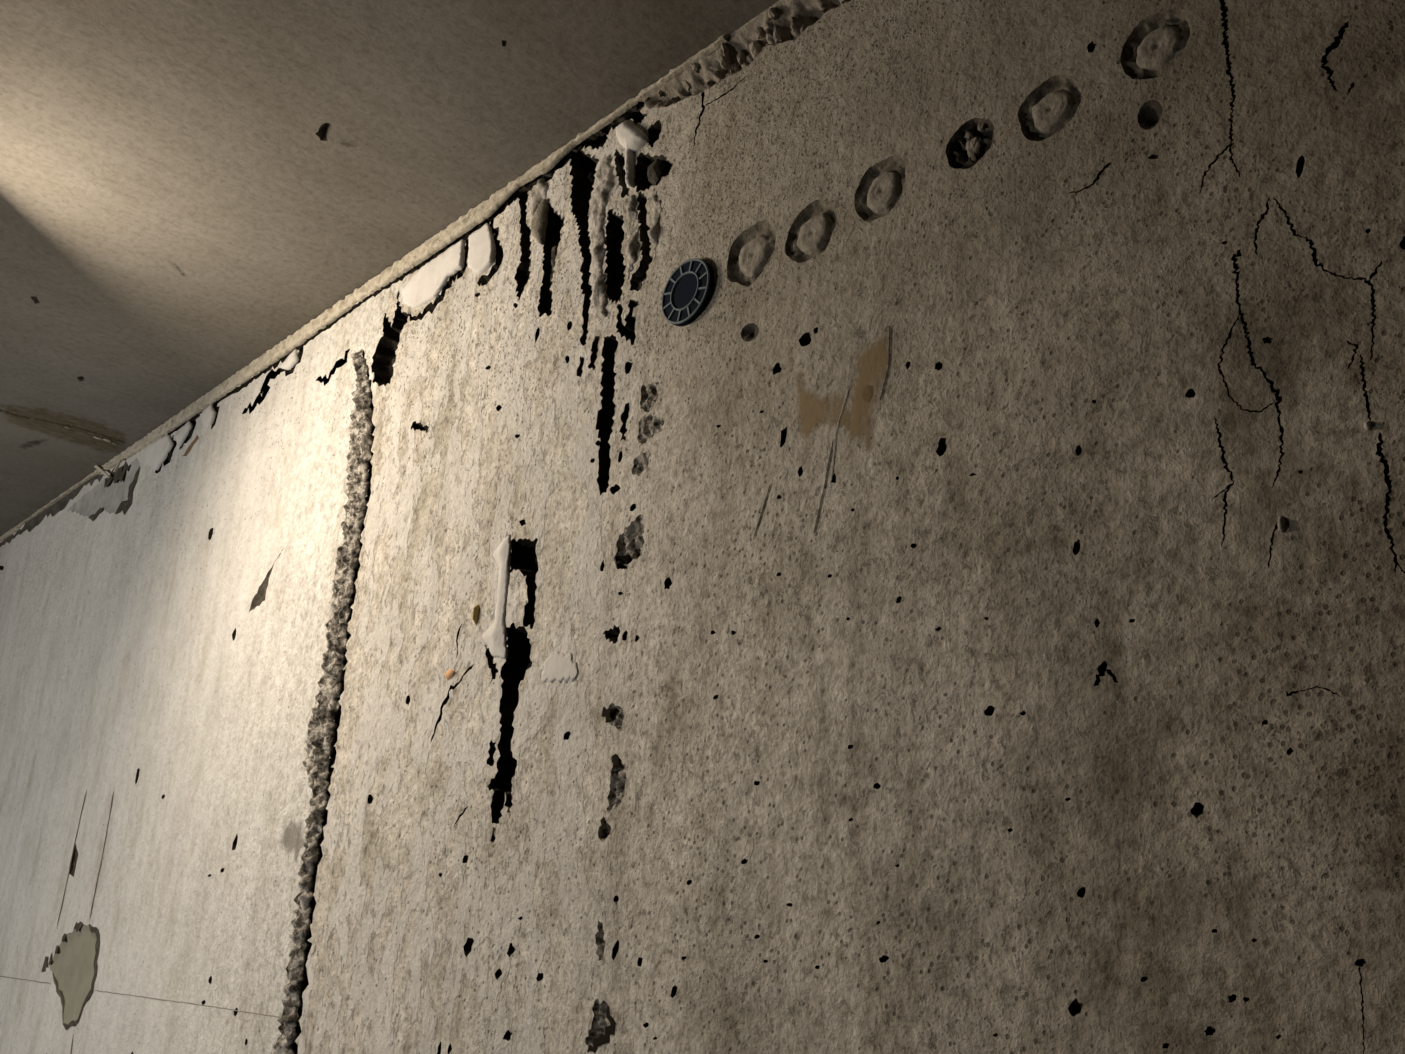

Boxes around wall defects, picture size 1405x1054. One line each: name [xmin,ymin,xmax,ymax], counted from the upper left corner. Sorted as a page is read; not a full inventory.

spalling [641,0,852,109]
crack [1200,0,1240,193]
crack [1321,21,1354,96]
leakage [616,120,650,188]
peeling [371,219,504,386]
crack [1213,197,1405,573]
peeling [0,401,220,547]
spalling [614,514,645,570]
peeling [472,534,579,843]
crack [1285,686,1341,697]
spalling [41,921,100,1030]
crack [1357,966,1365,1054]